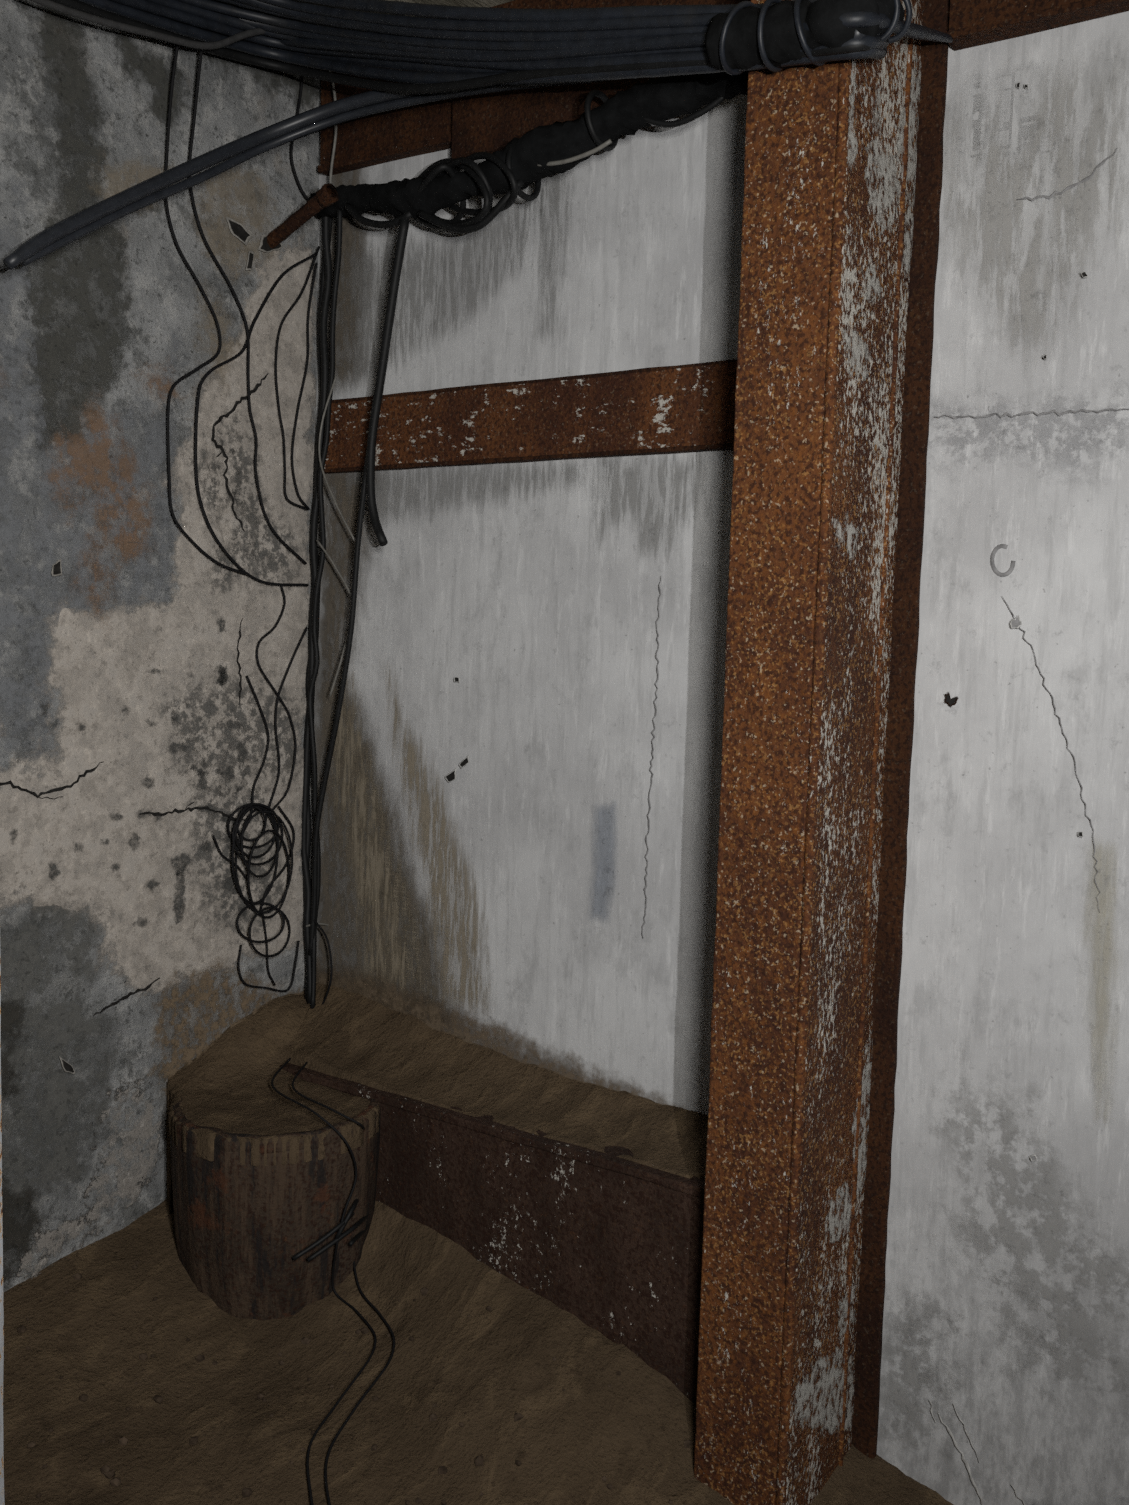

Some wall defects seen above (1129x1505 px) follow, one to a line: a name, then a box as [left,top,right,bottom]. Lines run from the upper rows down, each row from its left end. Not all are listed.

leakage [26,225,132,449]
leakage [20,0,160,228]
leakage [116,31,185,126]
leakage [203,41,321,109]
leakage [332,169,360,188]
leakage [327,173,560,382]
mould [198,419,297,591]
crack [0,762,103,799]
leakage [0,466,666,1289]
leakage [965,1107,1128,1374]